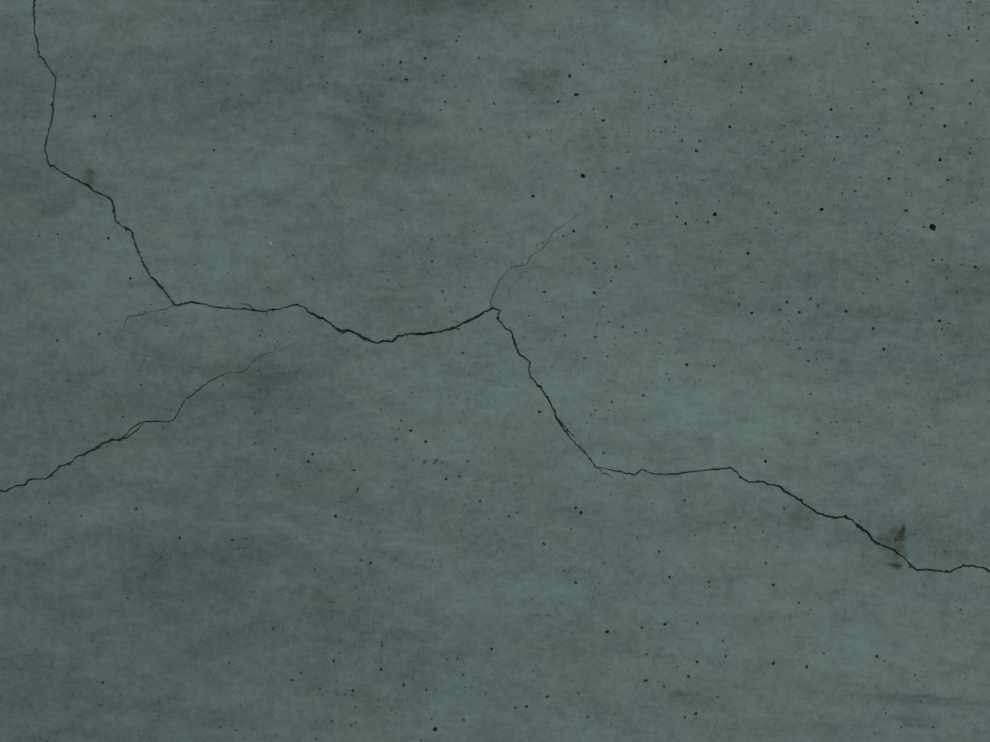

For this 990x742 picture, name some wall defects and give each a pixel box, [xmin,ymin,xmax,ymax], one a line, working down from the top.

crack [0,0,990,573]